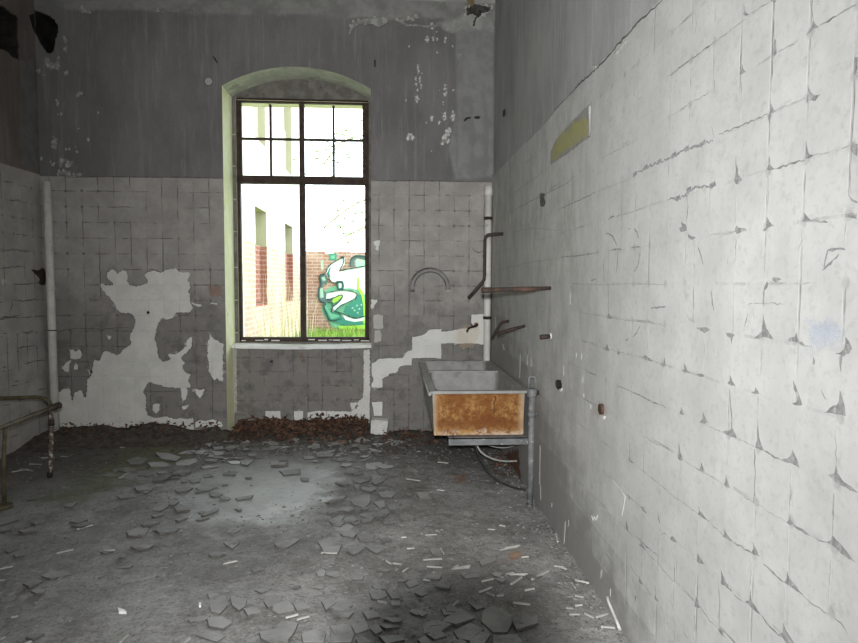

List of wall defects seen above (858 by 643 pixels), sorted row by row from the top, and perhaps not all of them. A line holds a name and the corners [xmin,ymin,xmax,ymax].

hole [0,5,20,60]
flaking render [349,0,495,56]
crack [525,0,662,143]
crack [668,1,856,138]
crack [742,145,851,213]
peeling [59,268,223,430]
peeling [206,333,237,412]
peeling [294,299,484,423]
crack [564,231,811,373]
crack [683,389,792,523]
crack [600,434,783,640]
crack [804,494,848,634]